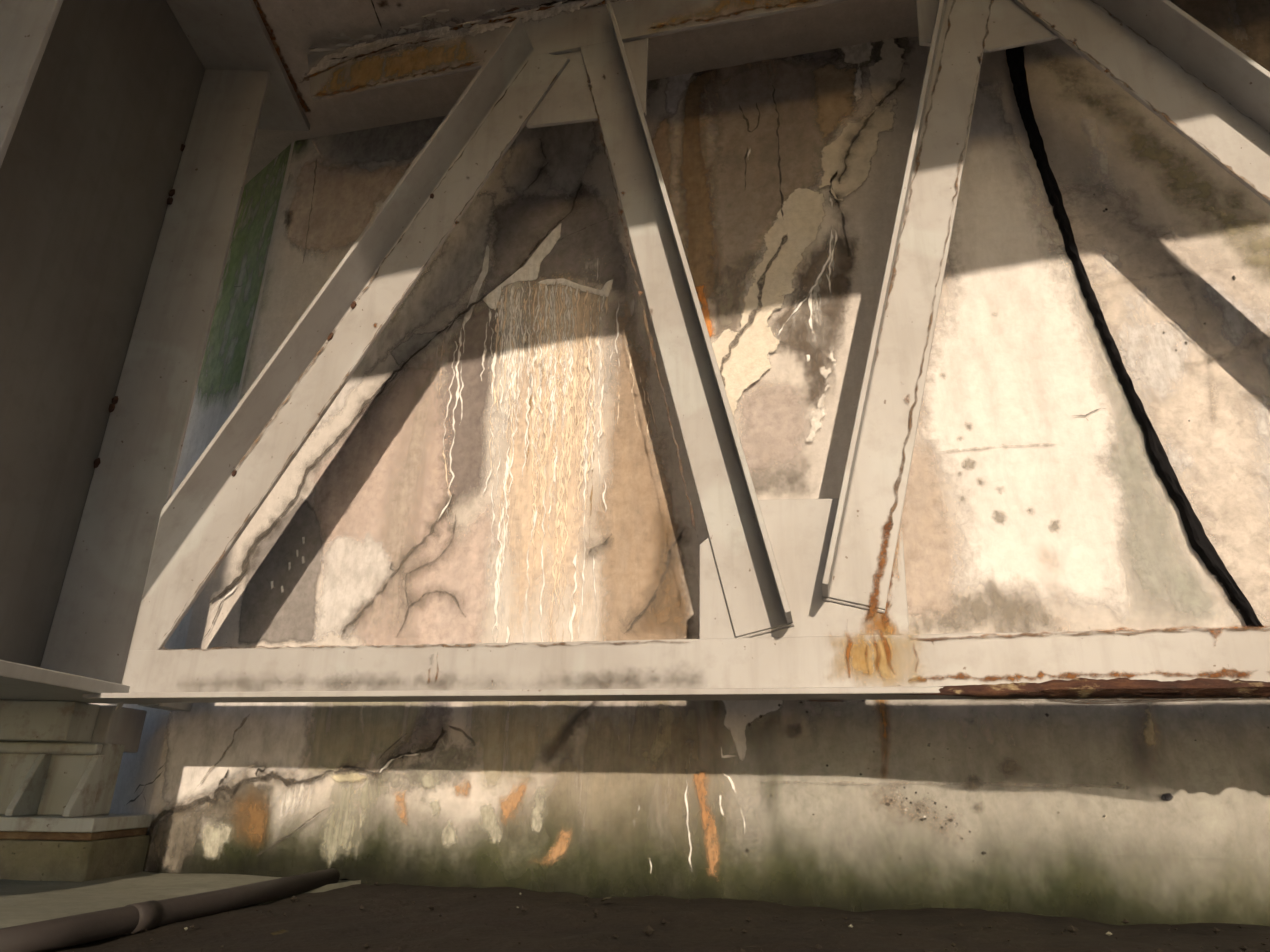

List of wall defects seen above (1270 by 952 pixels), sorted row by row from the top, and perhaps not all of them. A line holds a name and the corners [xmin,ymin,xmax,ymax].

peeling [301,0,635,78]
peeling [712,37,905,416]
corrosion [885,110,930,310]
water stain [314,189,689,646]
corrosion [845,312,933,680]
crack [127,716,475,836]
water stain [143,699,1270,912]
peeling [722,700,783,761]
corrosion [909,652,1270,704]